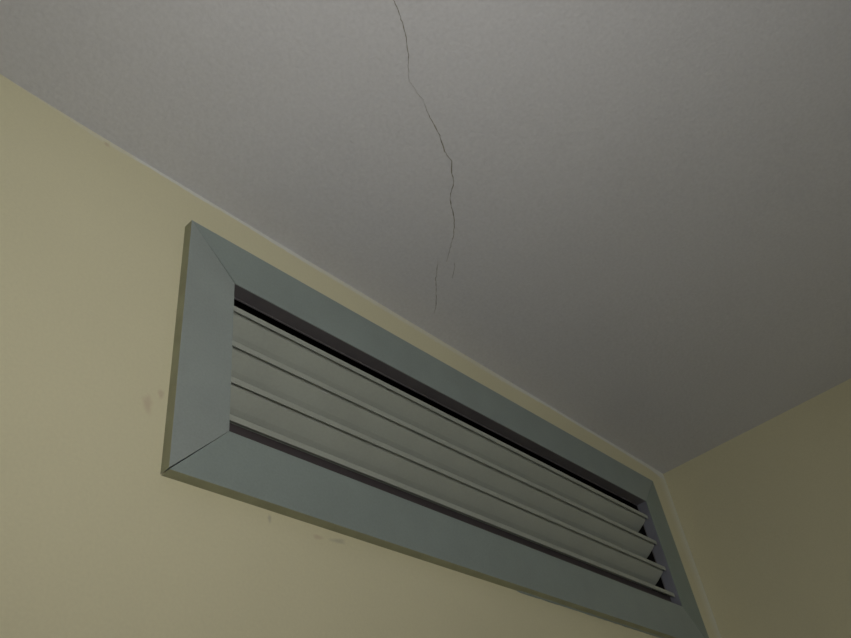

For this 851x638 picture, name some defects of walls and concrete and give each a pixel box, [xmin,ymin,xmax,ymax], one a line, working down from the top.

crack [393,0,455,312]